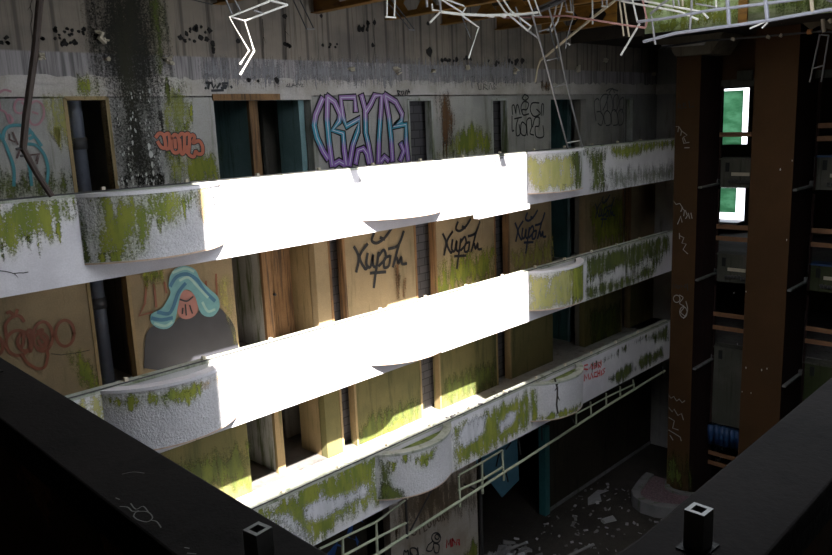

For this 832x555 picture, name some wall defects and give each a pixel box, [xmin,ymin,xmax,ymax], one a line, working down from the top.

leakage [86,0,180,188]
leakage [571,151,582,189]
leakage [72,197,122,263]
crack [553,378,561,414]
leakage [378,455,429,499]
leakage [395,466,479,540]